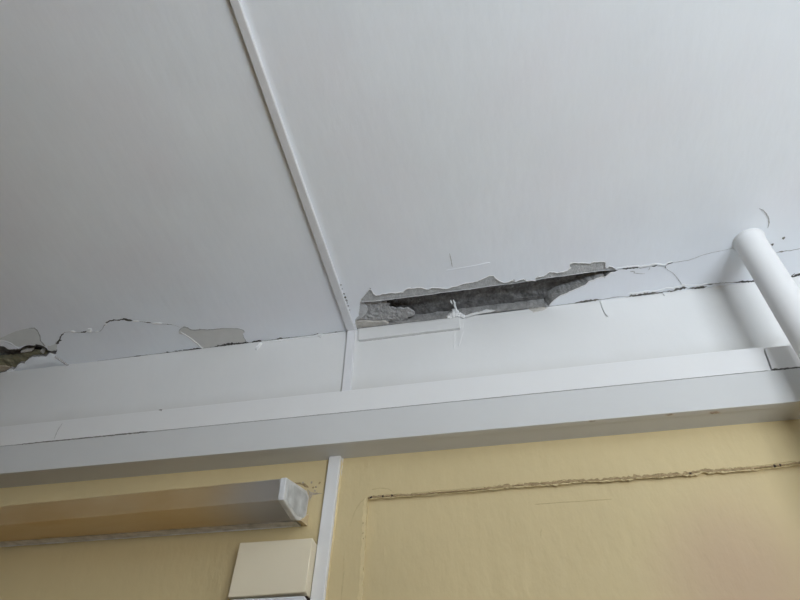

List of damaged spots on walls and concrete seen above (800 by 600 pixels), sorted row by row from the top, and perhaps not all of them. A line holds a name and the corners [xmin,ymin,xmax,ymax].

spalling [340,261,617,329]
crack [546,248,754,307]
spalling [0,328,57,373]
peeling [179,326,247,349]
crack [368,460,800,504]